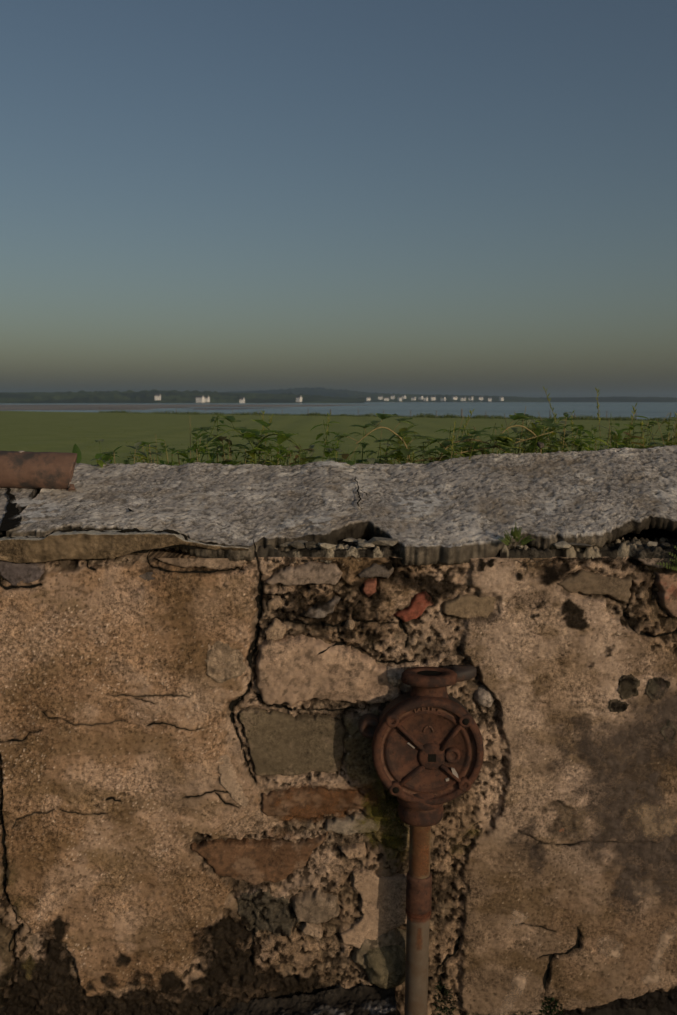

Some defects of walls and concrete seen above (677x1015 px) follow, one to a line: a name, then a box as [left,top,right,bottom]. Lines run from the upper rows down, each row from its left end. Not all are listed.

spalling [252,537,400,564]
spalling [500,537,677,563]
crack [0,488,416,785]
peeling [264,596,287,640]
crack [184,790,237,807]
damp [559,685,677,911]
crack [0,711,123,1005]
crack [523,834,615,850]
spalling [237,888,323,941]
peeling [338,842,407,949]
damp [0,916,333,1015]
crack [513,923,581,991]